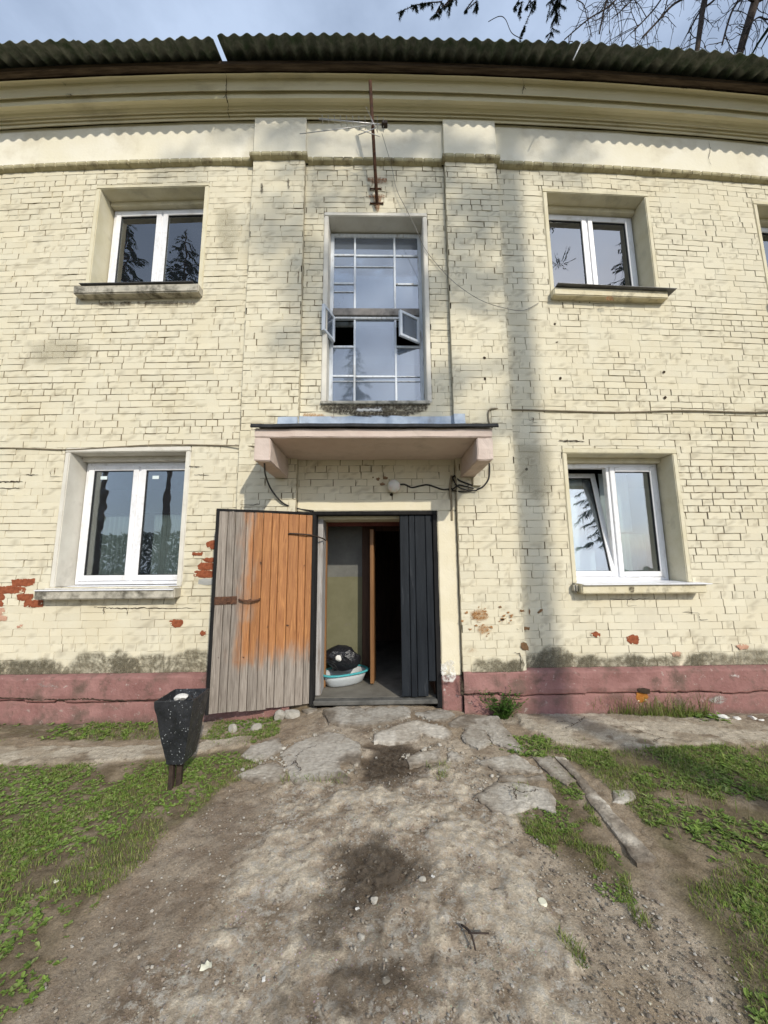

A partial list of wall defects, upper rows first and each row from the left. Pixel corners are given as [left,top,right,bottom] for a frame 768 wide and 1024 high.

flaking render [192,540,215,578]
flaking render [0,578,43,628]
peeling [461,606,543,651]
water stain [0,650,208,675]
water stain [473,647,768,681]